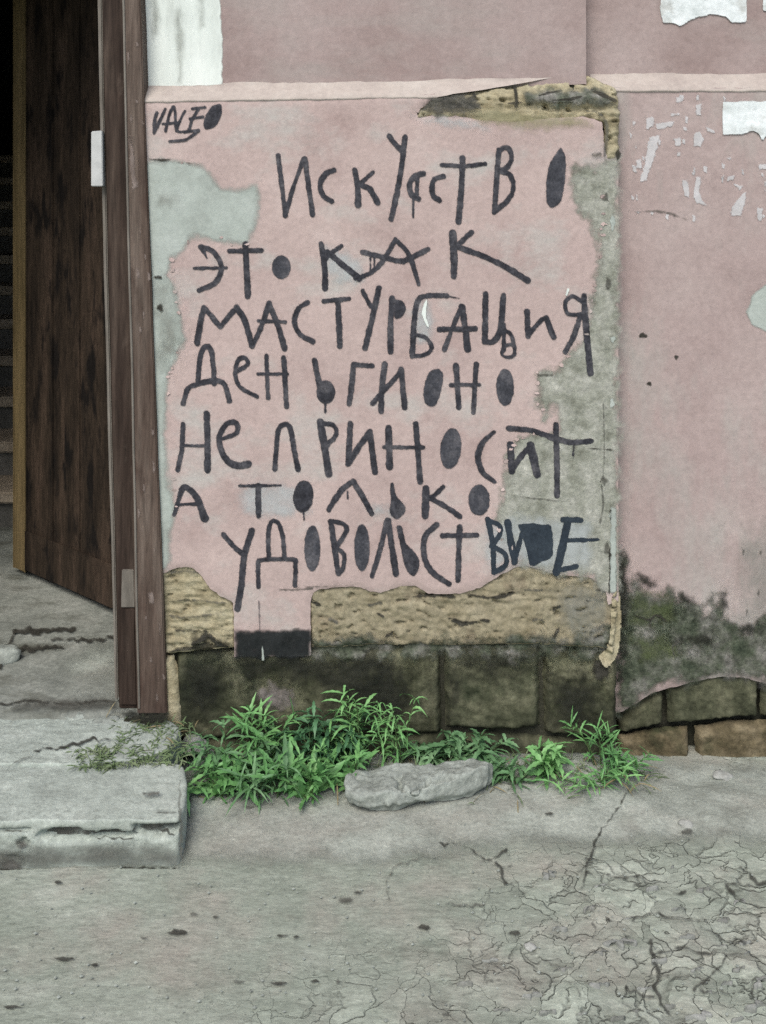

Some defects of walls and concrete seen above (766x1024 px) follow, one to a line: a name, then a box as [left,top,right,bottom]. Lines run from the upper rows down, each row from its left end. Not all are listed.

peeling [722,157,746,216]
peeling [129,140,260,653]
peeling [311,76,715,667]
damp [619,559,628,635]
crack [440,842,507,884]
crack [580,831,648,887]
crack [726,867,766,907]
crack [592,890,766,1014]